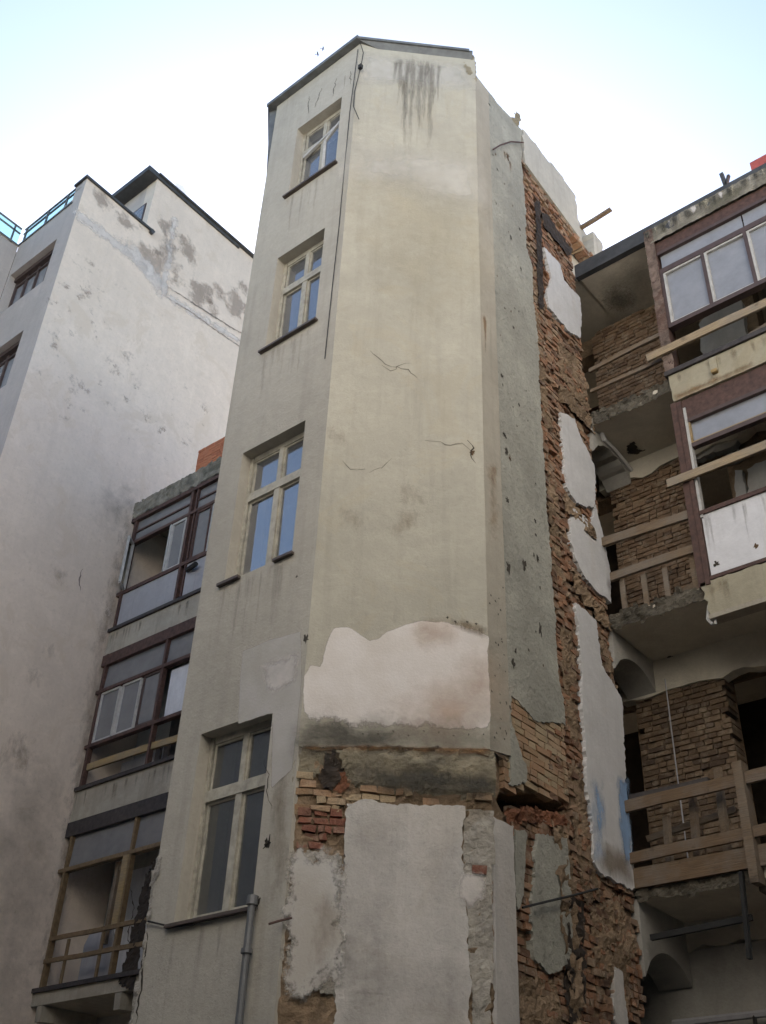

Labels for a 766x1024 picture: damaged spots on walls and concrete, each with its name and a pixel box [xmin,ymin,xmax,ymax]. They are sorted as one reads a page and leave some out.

crack [427,440,475,462]
flaking render [277,159,646,1024]
crack [127,887,148,1022]